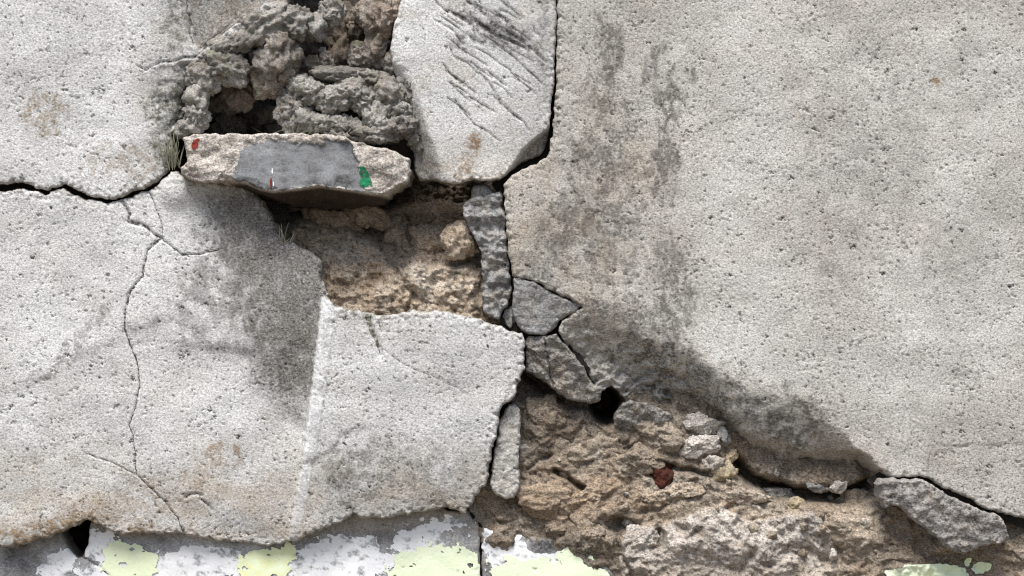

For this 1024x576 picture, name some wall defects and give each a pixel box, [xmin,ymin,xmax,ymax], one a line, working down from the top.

crack [0,168,217,532]
spalling [171,0,517,352]
spalling [36,338,1024,576]
crack [492,0,591,396]
leakage [539,14,696,326]
leakage [606,341,683,376]
leakage [760,382,831,454]
crack [867,472,1024,529]